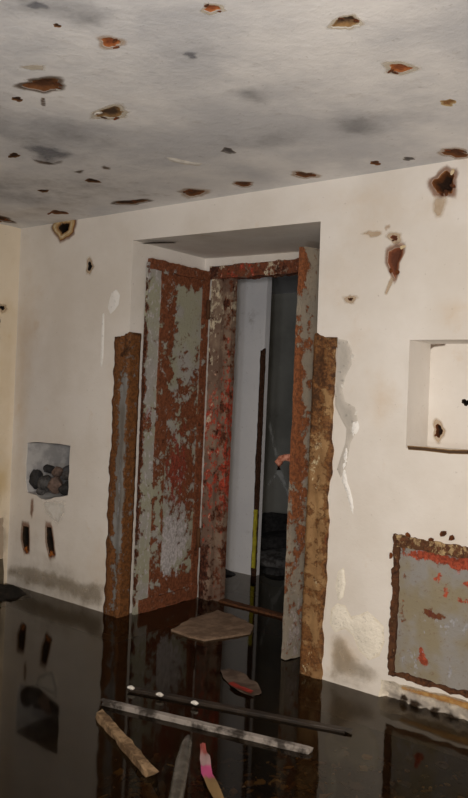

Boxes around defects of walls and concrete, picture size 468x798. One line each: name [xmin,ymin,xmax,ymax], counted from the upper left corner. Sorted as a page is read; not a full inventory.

spalling [328,15,363,29]
spalling [101,37,121,49]
spalling [384,62,417,75]
spalling [12,66,64,106]
spalling [92,105,128,120]
spalling [441,149,468,158]
spalling [429,167,457,215]
spalling [48,210,76,242]
peeling [335,339,359,513]
spalling [21,523,30,554]
spalling [45,524,55,558]
damp [330,568,385,660]